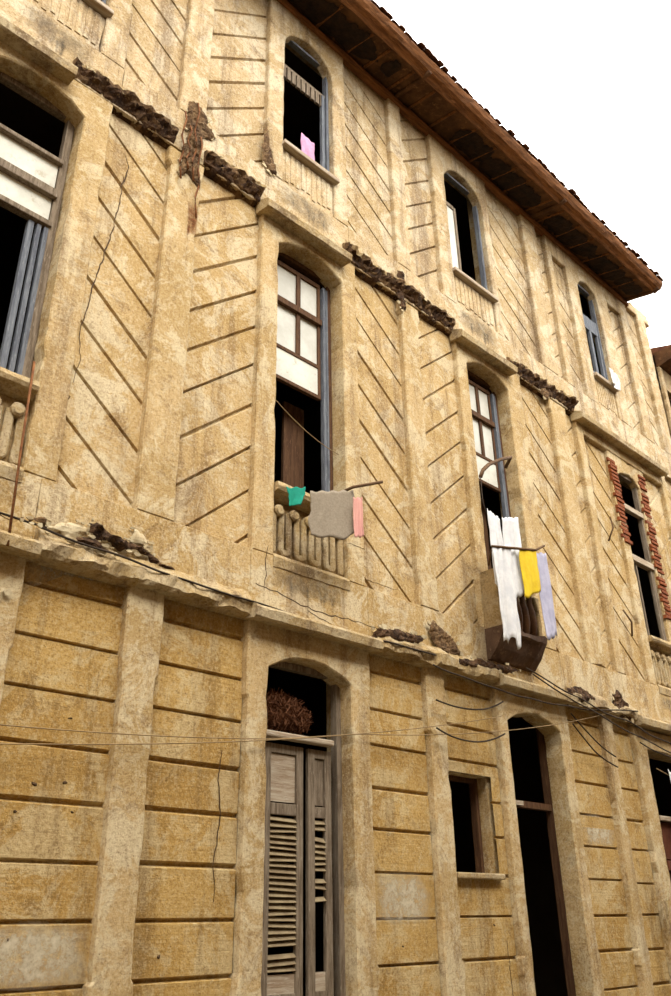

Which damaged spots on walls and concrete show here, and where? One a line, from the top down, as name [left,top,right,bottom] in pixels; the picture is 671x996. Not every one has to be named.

flaking render [172,101,217,219]
flaking render [262,128,277,176]
flaking render [396,270,407,312]
flaking render [20,516,175,570]
flaking render [371,620,521,675]
flaking render [567,686,596,706]
flaking render [612,690,634,723]